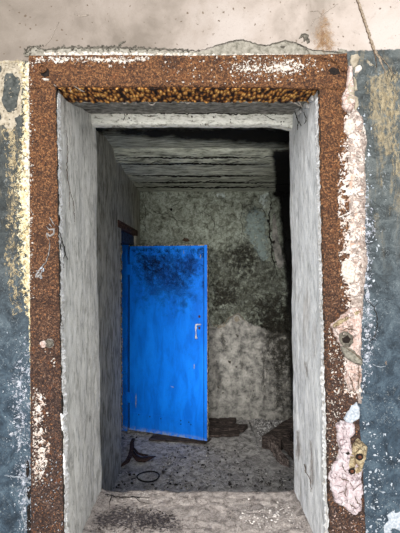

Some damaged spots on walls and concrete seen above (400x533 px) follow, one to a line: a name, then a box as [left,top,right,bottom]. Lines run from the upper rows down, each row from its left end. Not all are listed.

spalling [0,33,347,320]
leakage [209,192,293,420]
peeling [337,69,400,404]